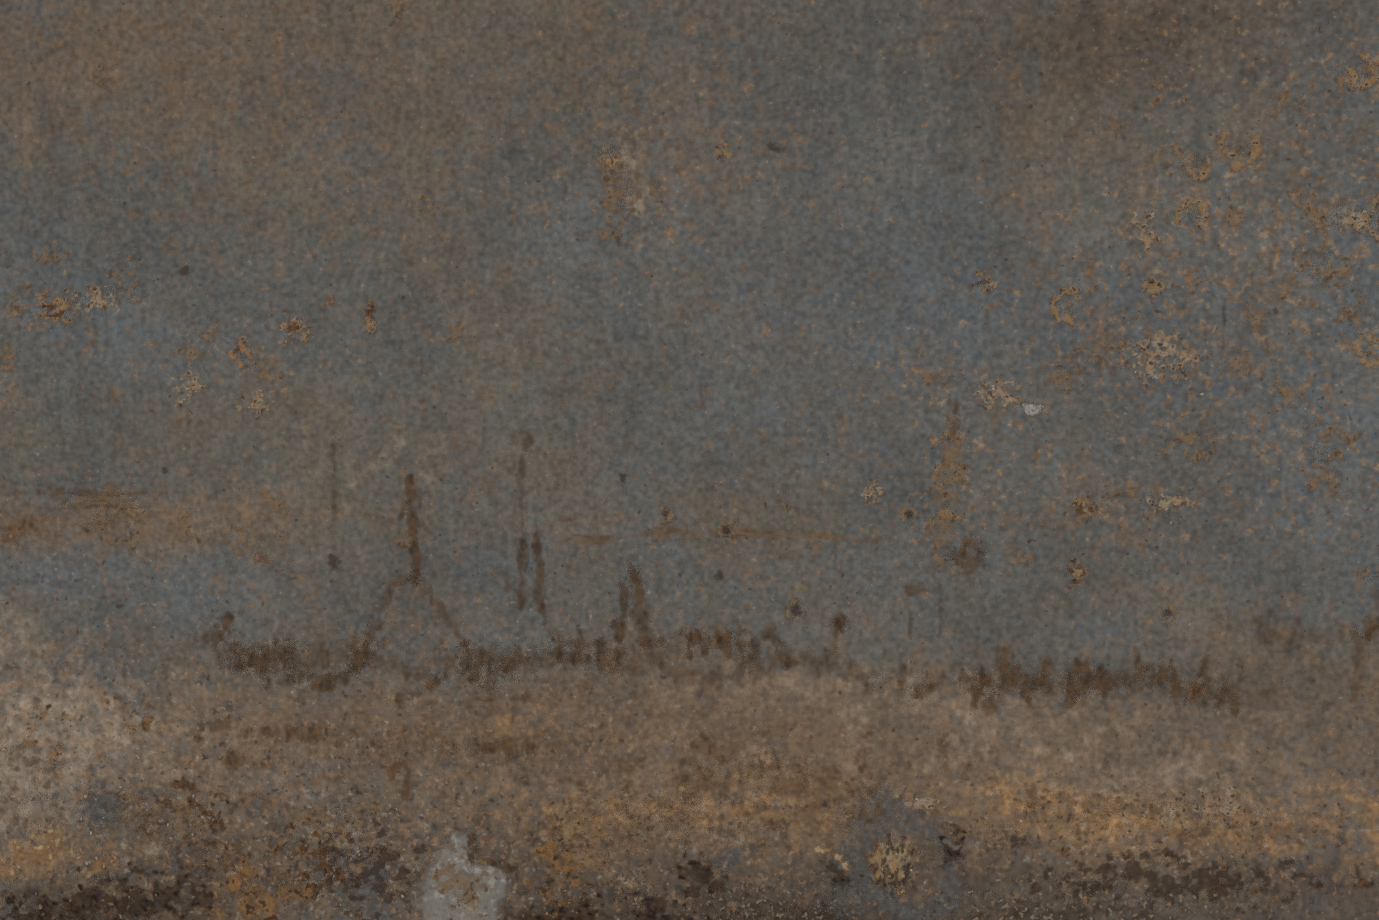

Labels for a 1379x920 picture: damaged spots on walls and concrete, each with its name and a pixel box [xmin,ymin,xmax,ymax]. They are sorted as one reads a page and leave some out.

corrosion [1153,130,1262,229]
corrosion [6,252,140,326]
corrosion [167,318,281,419]
corrosion [969,380,1021,410]
corrosion [1048,257,1204,396]
water stain [397,475,421,571]
corrosion [928,418,971,569]
corrosion [1065,484,1197,524]
water stain [518,534,544,612]
water stain [614,569,651,662]
corrosion [0,763,428,920]